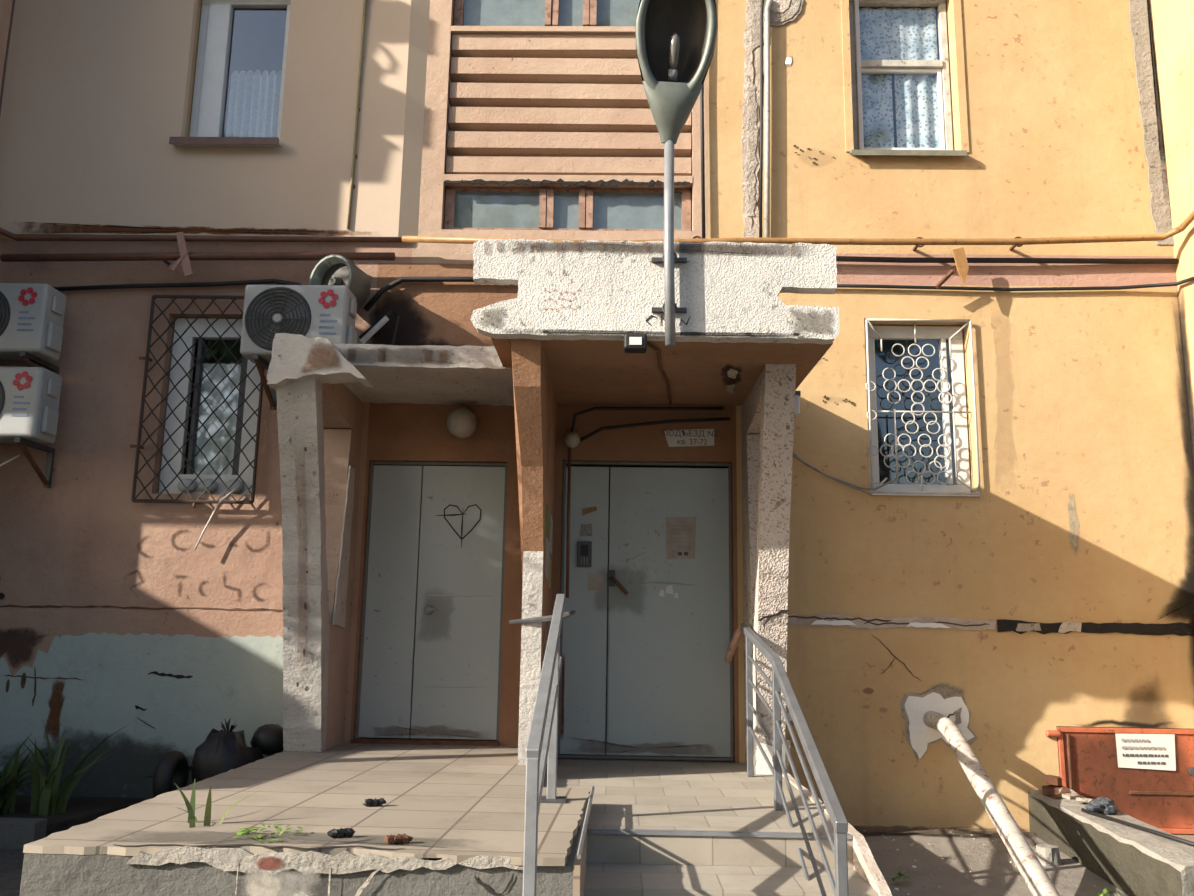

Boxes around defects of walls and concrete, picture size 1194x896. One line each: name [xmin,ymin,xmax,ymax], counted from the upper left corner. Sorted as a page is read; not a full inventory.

water stain [1162,305,1194,668]
crack [0,604,283,612]
peeling [0,629,43,693]
crack [4,667,81,706]
crack [148,671,193,679]
crack [757,610,990,682]
peeling [947,707,962,725]
water stain [1078,695,1191,816]